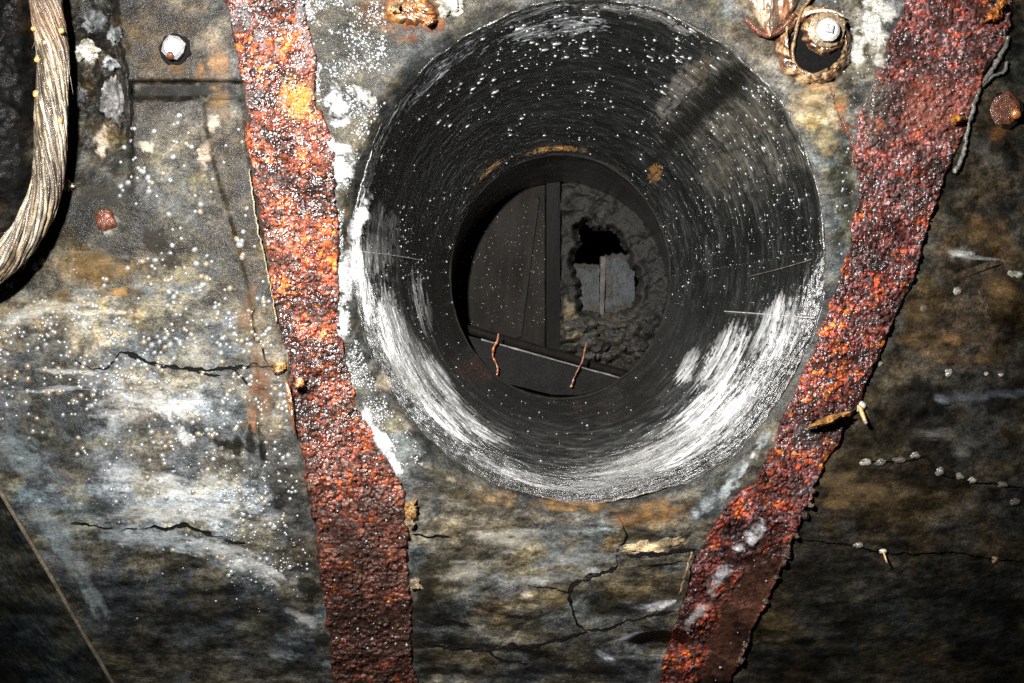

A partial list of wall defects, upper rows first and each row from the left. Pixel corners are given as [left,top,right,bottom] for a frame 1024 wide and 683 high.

corrosion [398,19,444,43]
water stain [413,5,600,99]
water stain [328,139,352,179]
corrosion [988,108,1021,141]
water stain [337,109,501,444]
crack [75,307,274,390]
corrosion [199,0,419,683]
corrosion [658,0,1017,683]
water stain [363,410,403,474]
crack [70,522,245,545]
crack [420,513,696,664]
spalling [621,536,689,566]